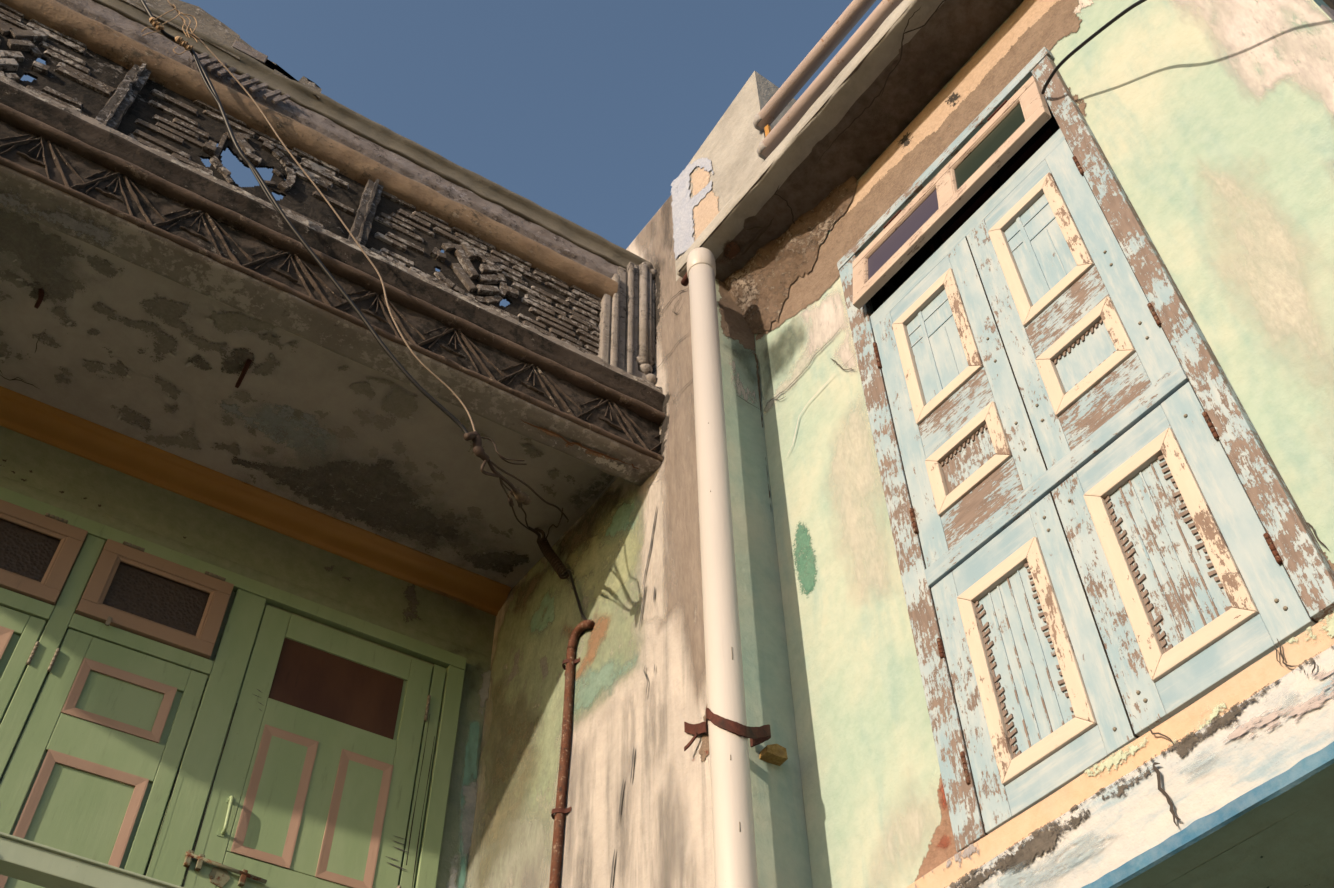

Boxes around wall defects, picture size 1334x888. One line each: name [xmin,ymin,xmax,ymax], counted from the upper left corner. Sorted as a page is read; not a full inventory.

peeling [1176,0,1334,114]
peeling [690,167,721,241]
spalling [716,0,1093,369]
peeling [0,208,299,456]
water stain [465,476,642,888]
rust [574,617,609,682]
peeling [1084,736,1148,776]
crack [1148,727,1181,826]
peeling [1168,701,1226,745]
peeling [1223,669,1334,743]
spalling [914,773,979,888]
peeling [999,835,1108,888]